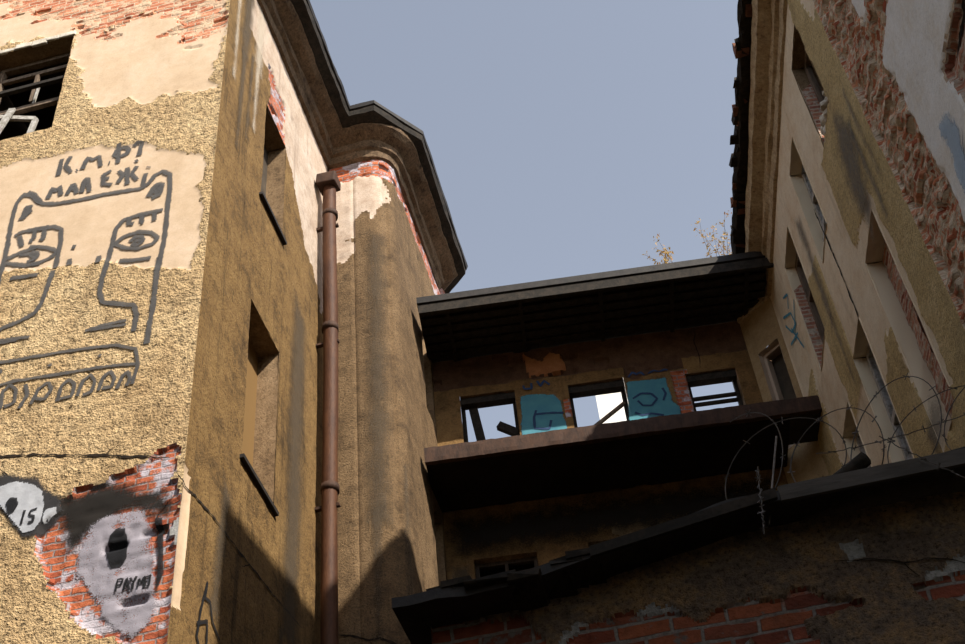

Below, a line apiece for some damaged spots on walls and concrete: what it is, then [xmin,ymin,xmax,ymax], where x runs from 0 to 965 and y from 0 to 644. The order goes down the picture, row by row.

flaking render [0,0,229,108]
flaking render [0,141,207,272]
flaking render [250,0,445,314]
flaking render [770,0,965,467]
flaking render [34,443,191,644]
crack [0,446,301,627]
crack [340,634,397,644]
flaking render [911,571,965,601]